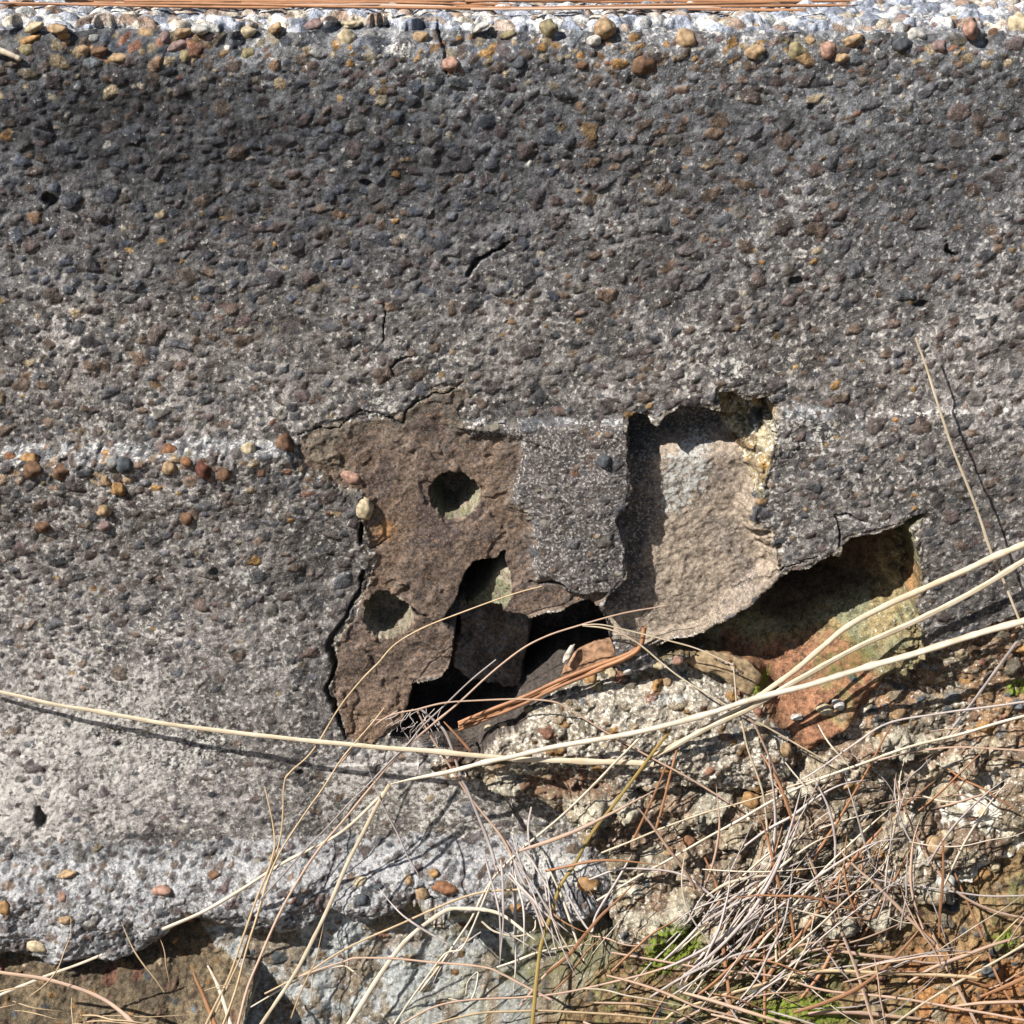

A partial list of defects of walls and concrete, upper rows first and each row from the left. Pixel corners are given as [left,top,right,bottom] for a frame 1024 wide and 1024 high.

crack [466,241,511,276]
crack [325,536,391,738]
spalling [293,379,933,767]